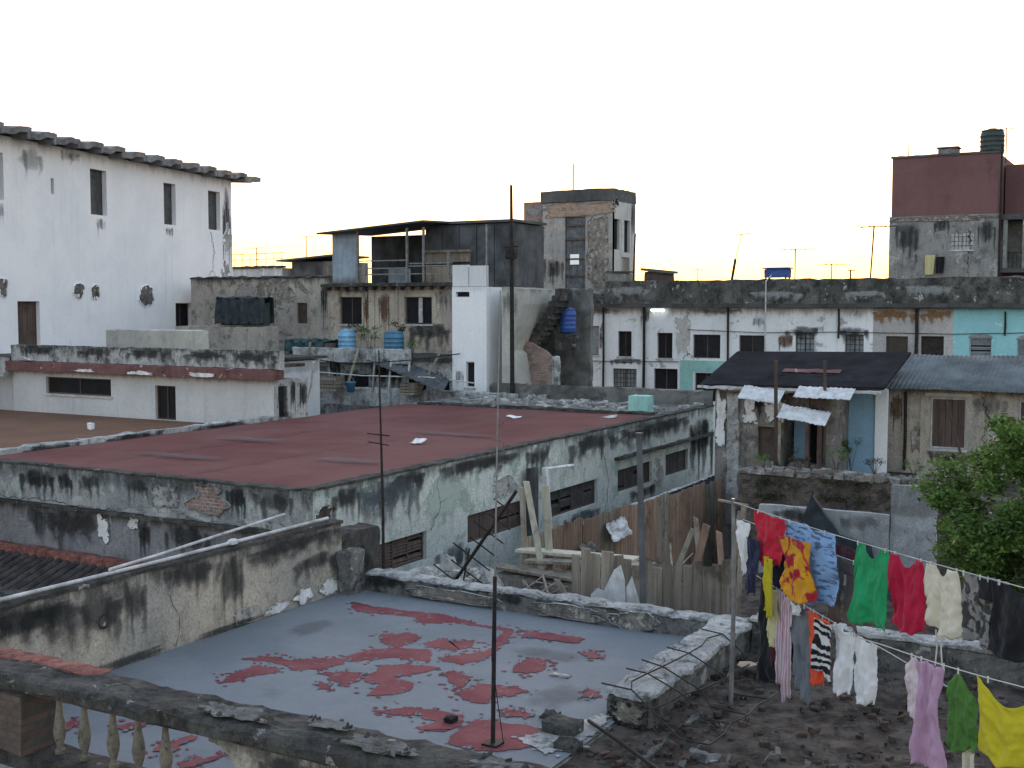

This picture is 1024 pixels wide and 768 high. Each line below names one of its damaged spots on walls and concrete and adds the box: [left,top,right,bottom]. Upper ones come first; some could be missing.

spalling [72,282,100,300]
spalling [138,284,155,307]
rust [873,311,951,323]
damp [569,417,714,469]
damp [19,469,98,499]
peeling [96,509,110,545]
spalling [121,481,232,530]
damp [165,472,425,611]
damp [0,585,147,642]
spalling [233,577,338,625]
damp [101,647,161,669]
peeling [213,601,606,768]